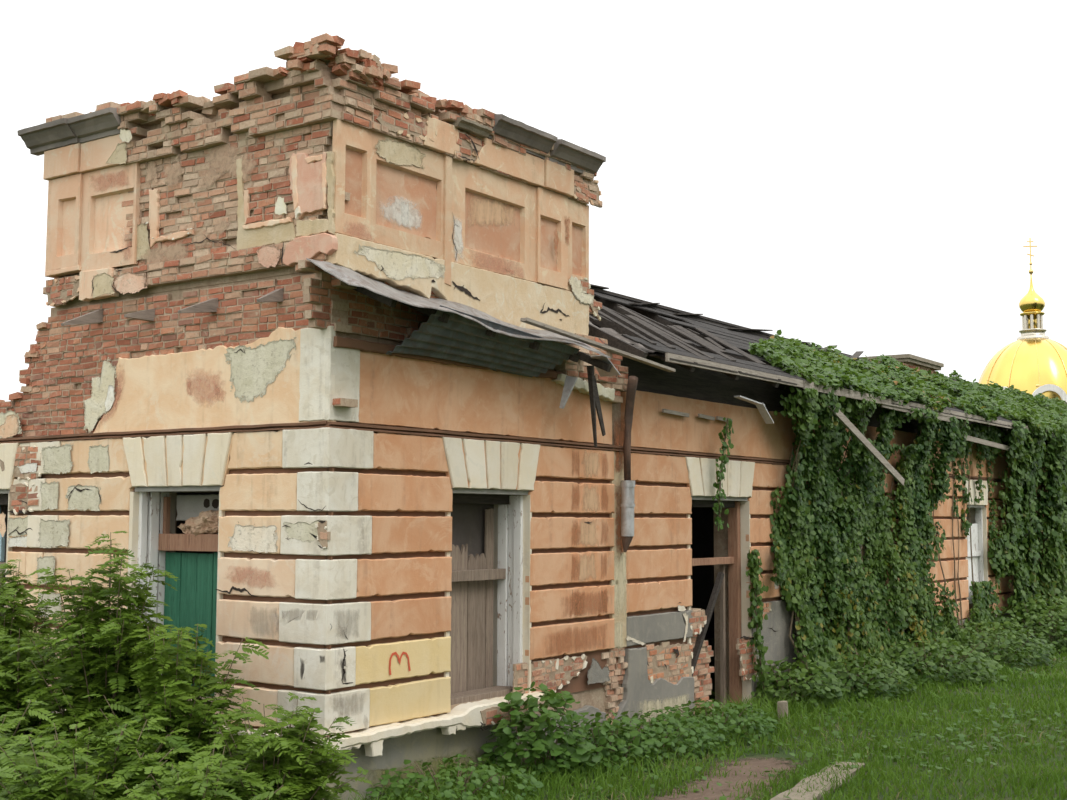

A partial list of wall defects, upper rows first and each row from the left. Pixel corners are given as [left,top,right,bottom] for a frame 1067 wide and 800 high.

crack [431,213,480,301]
flaking render [0,59,445,617]
crack [540,303,570,320]
crack [215,586,257,597]
flaking render [626,605,707,684]
flaking render [480,654,588,726]